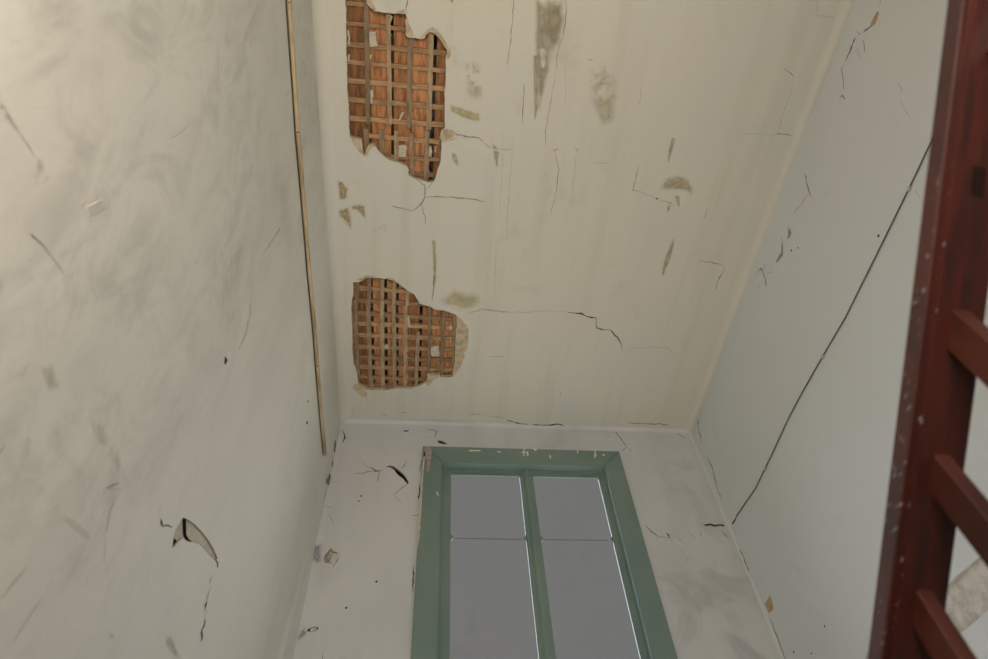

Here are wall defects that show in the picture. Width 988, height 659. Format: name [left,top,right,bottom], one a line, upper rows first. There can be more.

spalling [345,0,456,183]
leakage [534,6,561,114]
crack [840,0,881,100]
crack [393,1,676,358]
spalling [351,276,469,398]
crack [323,412,437,523]